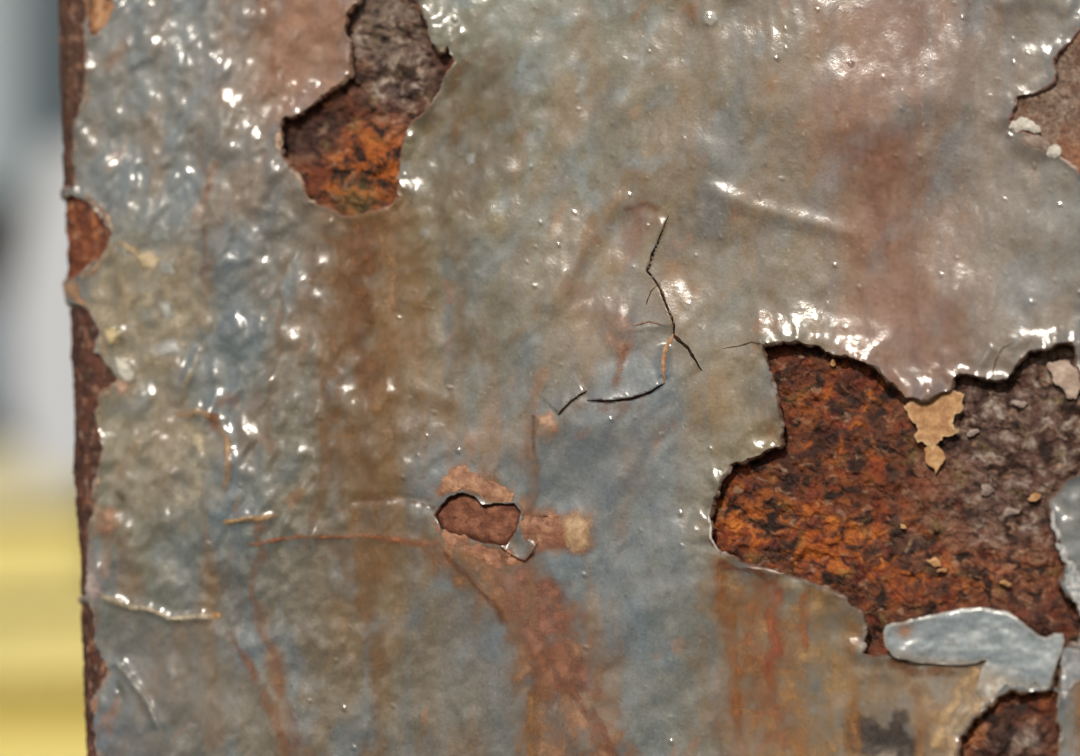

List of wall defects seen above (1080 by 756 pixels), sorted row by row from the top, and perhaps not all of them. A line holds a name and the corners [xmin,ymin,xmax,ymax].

peeling [275,0,457,217]
peeling [1008,27,1080,175]
peeling [58,0,210,756]
peeling [129,409,231,505]
peeling [434,464,590,568]
corrosion [406,539,632,756]
corrosion [526,412,557,455]
corrosion [521,503,590,554]
crack [558,215,702,415]
peeling [707,340,1080,756]